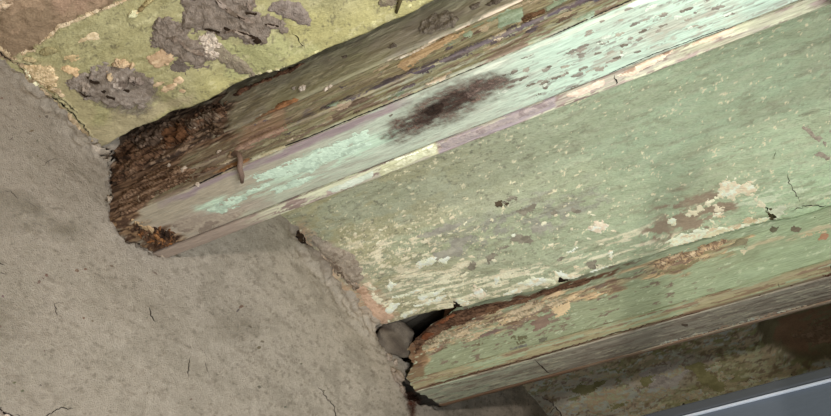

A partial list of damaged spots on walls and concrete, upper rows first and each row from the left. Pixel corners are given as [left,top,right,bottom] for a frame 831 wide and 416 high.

peeling [128,0,154,18]
peeling [0,0,127,160]
flaking render [146,49,174,68]
flaking render [153,76,186,93]
peeling [193,85,369,174]
water stain [381,76,512,139]
peeling [328,0,735,193]
peeling [207,129,372,214]
peeling [653,176,787,274]
peeling [791,226,829,241]
peeling [660,305,807,345]
crack [45,406,73,416]